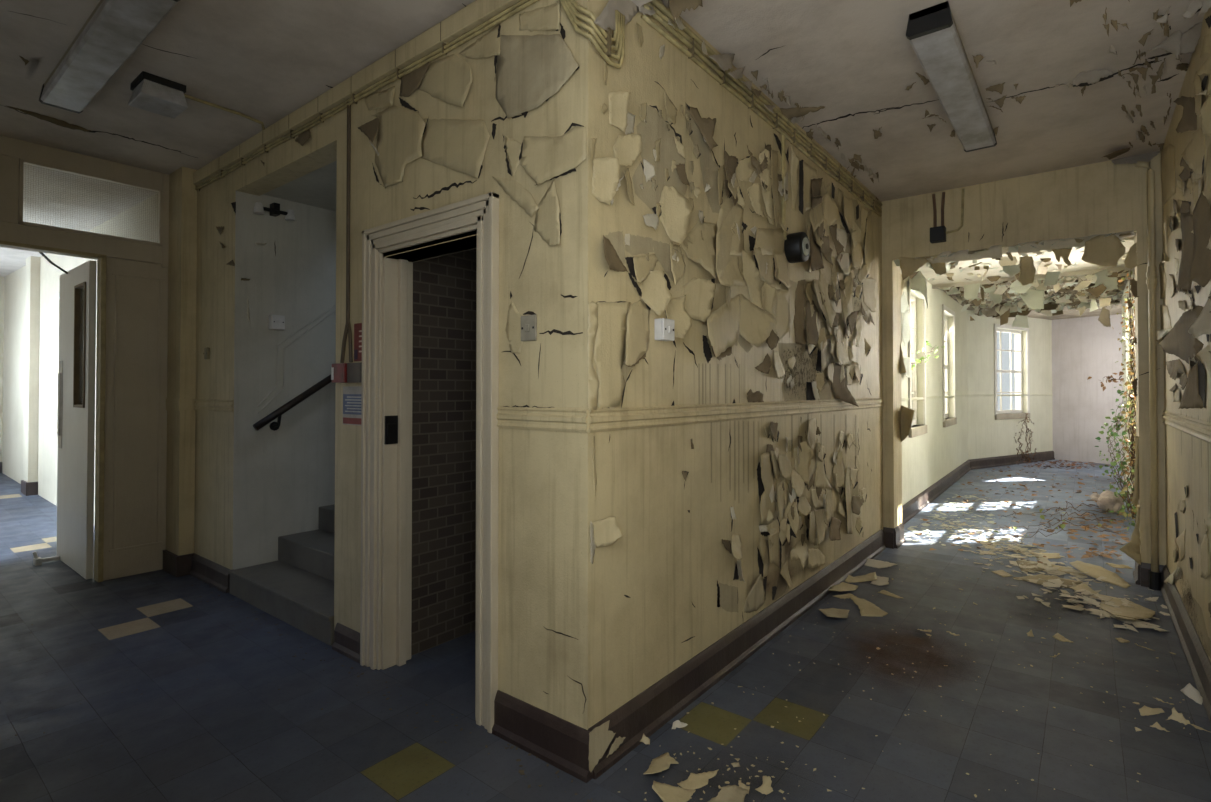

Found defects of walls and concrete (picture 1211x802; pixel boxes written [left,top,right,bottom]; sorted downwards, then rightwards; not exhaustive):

crack [802,99,939,129]
peeling [986,82,1026,111]
crack [991,60,1162,102]
peeling [358,0,879,410]
peeling [1102,0,1211,409]
peeling [893,231,1139,380]
peeling [901,405,915,442]
peeling [717,418,872,617]
peeling [1119,435,1141,565]
peeling [1164,485,1211,585]